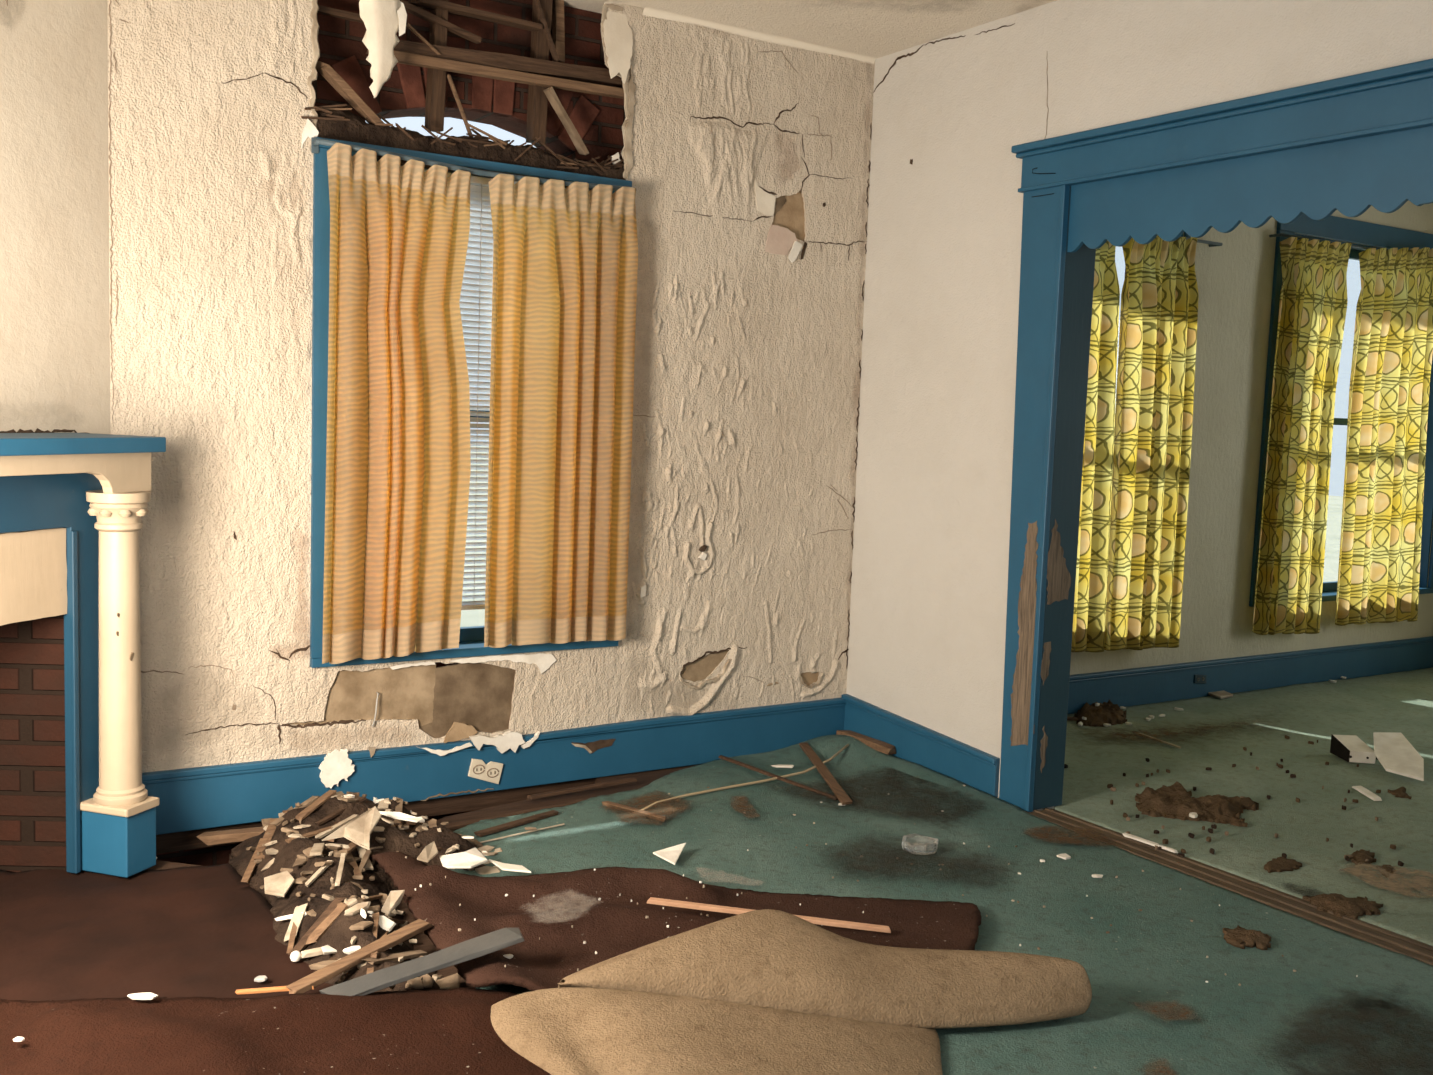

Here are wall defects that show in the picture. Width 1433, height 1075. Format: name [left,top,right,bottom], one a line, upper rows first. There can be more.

spalling [301,0,320,146]
peeling [359,0,407,98]
spalling [601,1,636,179]
crack [1043,61,1051,138]
spalling [754,176,807,263]
crack [675,23,1015,669]
crack [141,665,281,744]
crack [269,645,310,661]
flaking render [280,653,556,756]
peeling [1010,519,1071,773]